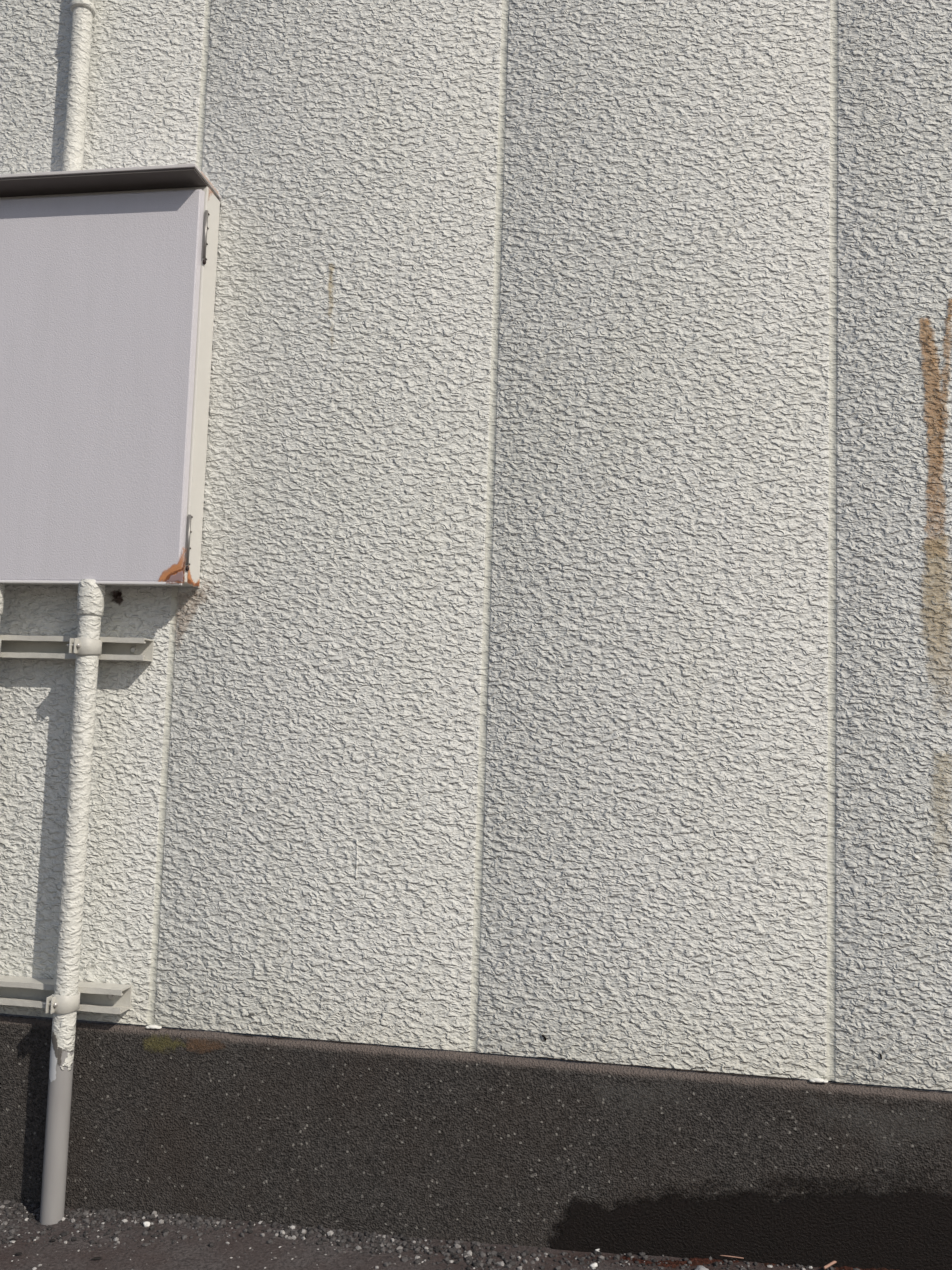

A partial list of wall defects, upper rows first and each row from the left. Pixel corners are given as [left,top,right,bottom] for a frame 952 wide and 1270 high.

rust [920,299,952,641]
damp [548,1170,952,1270]